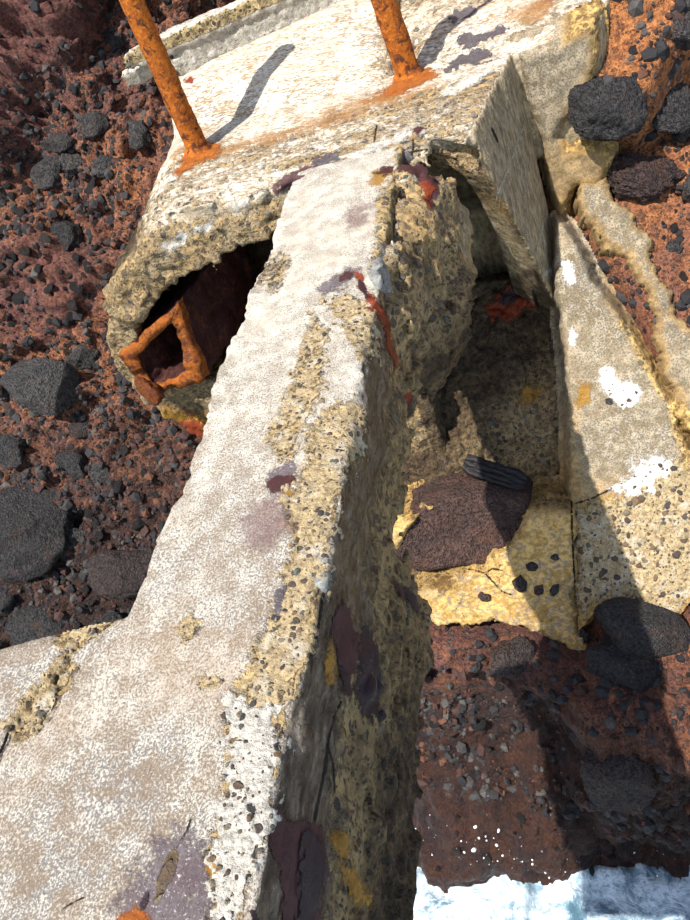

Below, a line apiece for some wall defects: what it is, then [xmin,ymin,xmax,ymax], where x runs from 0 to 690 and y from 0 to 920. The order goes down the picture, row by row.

spalling [254,245,292,290]
corrosion [315,266,400,370]
crack [465,568,511,595]
crack [570,476,636,583]
spalling [574,450,690,615]
crack [0,685,50,754]
corrosion [106,820,215,920]